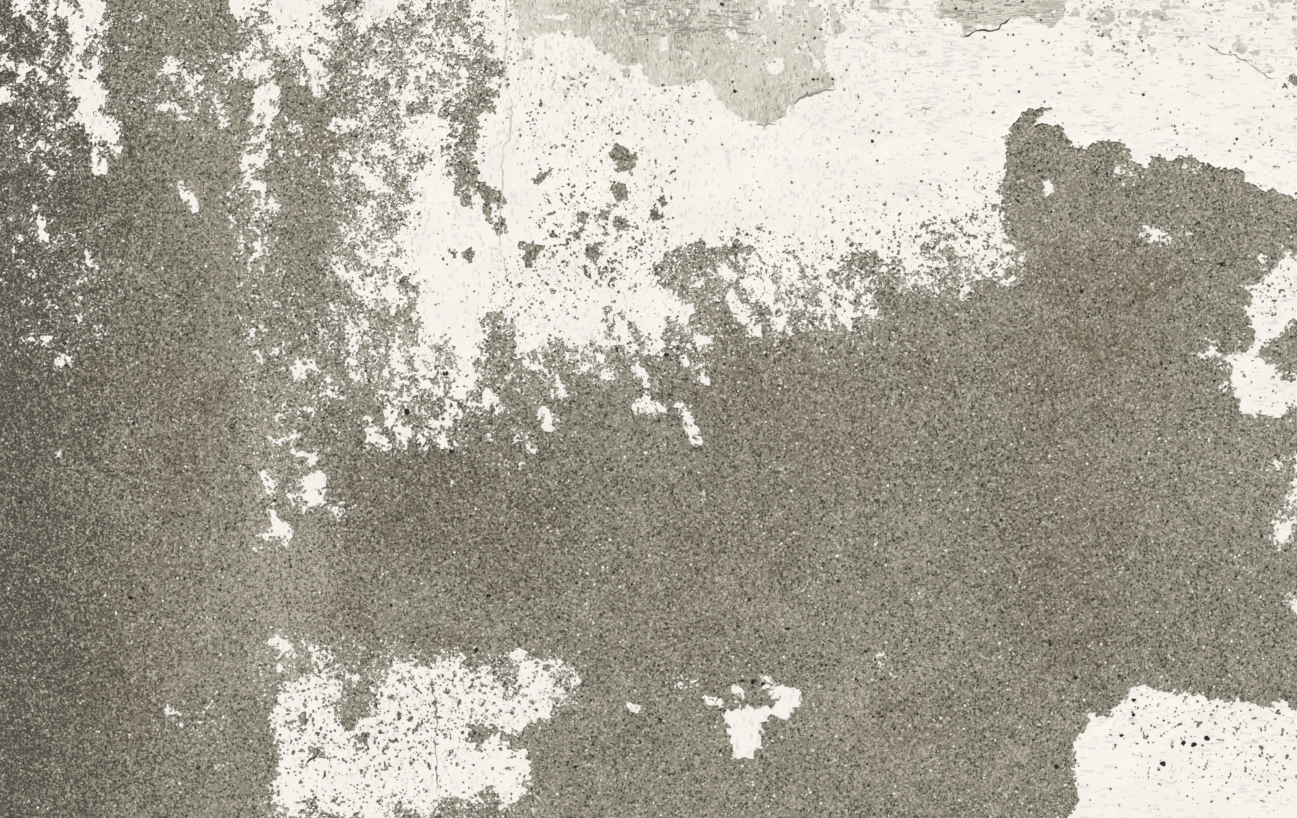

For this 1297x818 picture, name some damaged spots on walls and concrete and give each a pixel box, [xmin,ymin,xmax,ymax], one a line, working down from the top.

peeling [539,13,570,21]
peeling [586,0,710,174]
peeling [514,73,612,155]
peeling [643,175,672,221]
peeling [434,248,475,263]